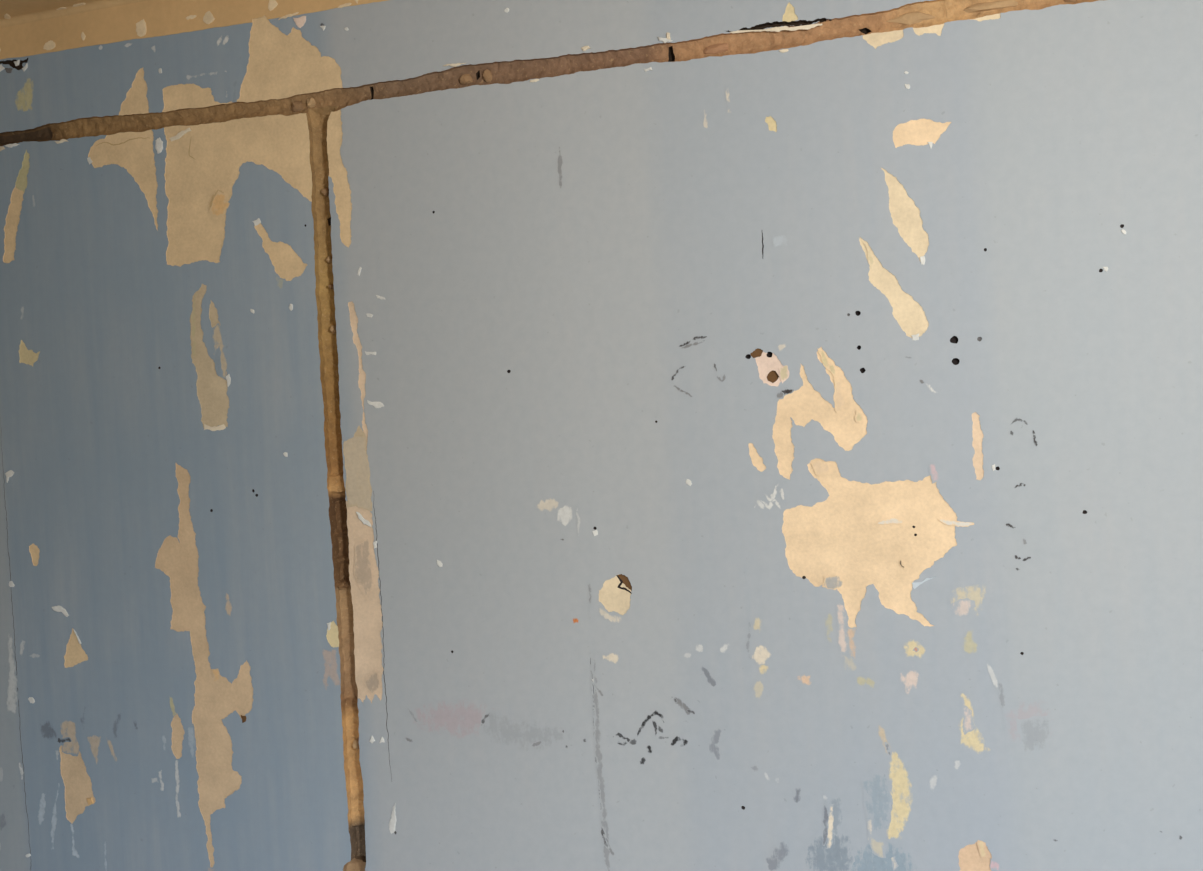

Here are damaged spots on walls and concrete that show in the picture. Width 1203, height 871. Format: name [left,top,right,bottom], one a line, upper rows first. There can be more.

peeling [190,284,231,431]
peeling [87,0,343,267]
peeling [252,218,307,289]
peeling [327,109,352,248]
peeling [859,237,929,341]
peeling [881,168,929,265]
peeling [155,463,253,871]
peeling [322,301,392,779]
flaking render [587,574,632,624]
peeling [745,342,974,629]
peeling [37,719,119,860]
peeling [877,721,914,842]